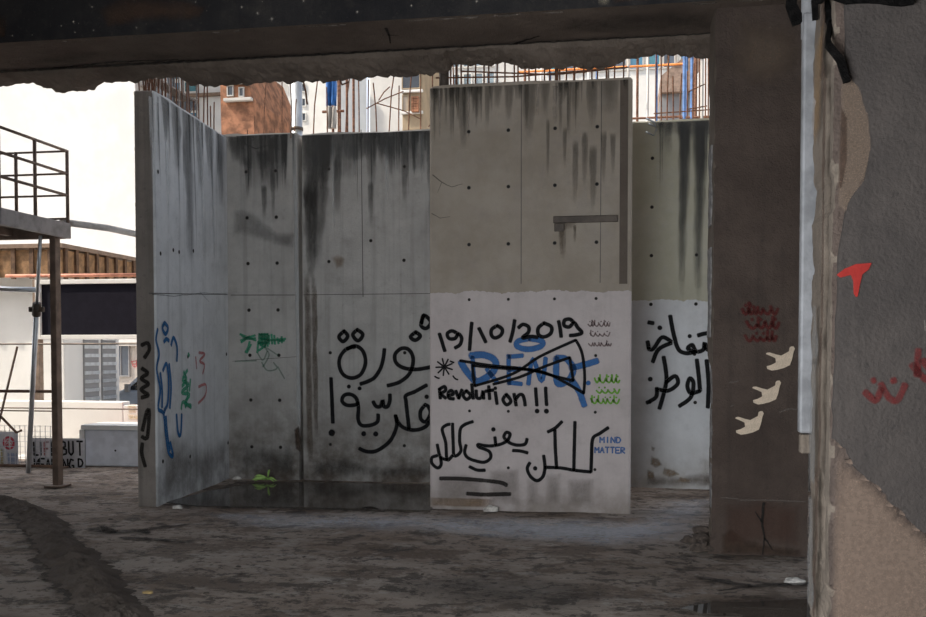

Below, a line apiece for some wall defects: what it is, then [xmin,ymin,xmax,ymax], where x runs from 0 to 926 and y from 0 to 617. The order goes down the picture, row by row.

spalling [450,63,551,85]
spalling [566,60,625,80]
damp [150,93,430,256]
damp [660,120,709,224]
damp [295,231,317,429]